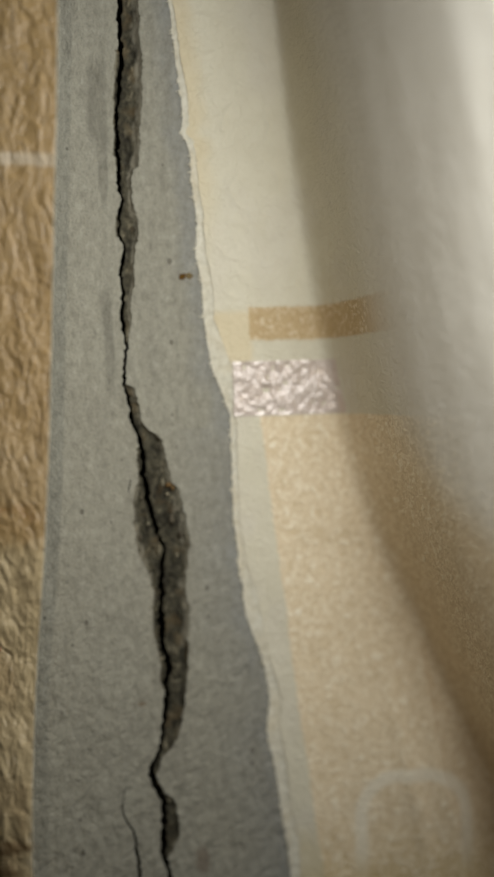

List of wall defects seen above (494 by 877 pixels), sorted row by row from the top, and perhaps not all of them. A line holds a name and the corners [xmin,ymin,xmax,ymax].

flaking render [112,0,143,342]
crack [114,0,174,877]
flaking render [124,385,191,858]